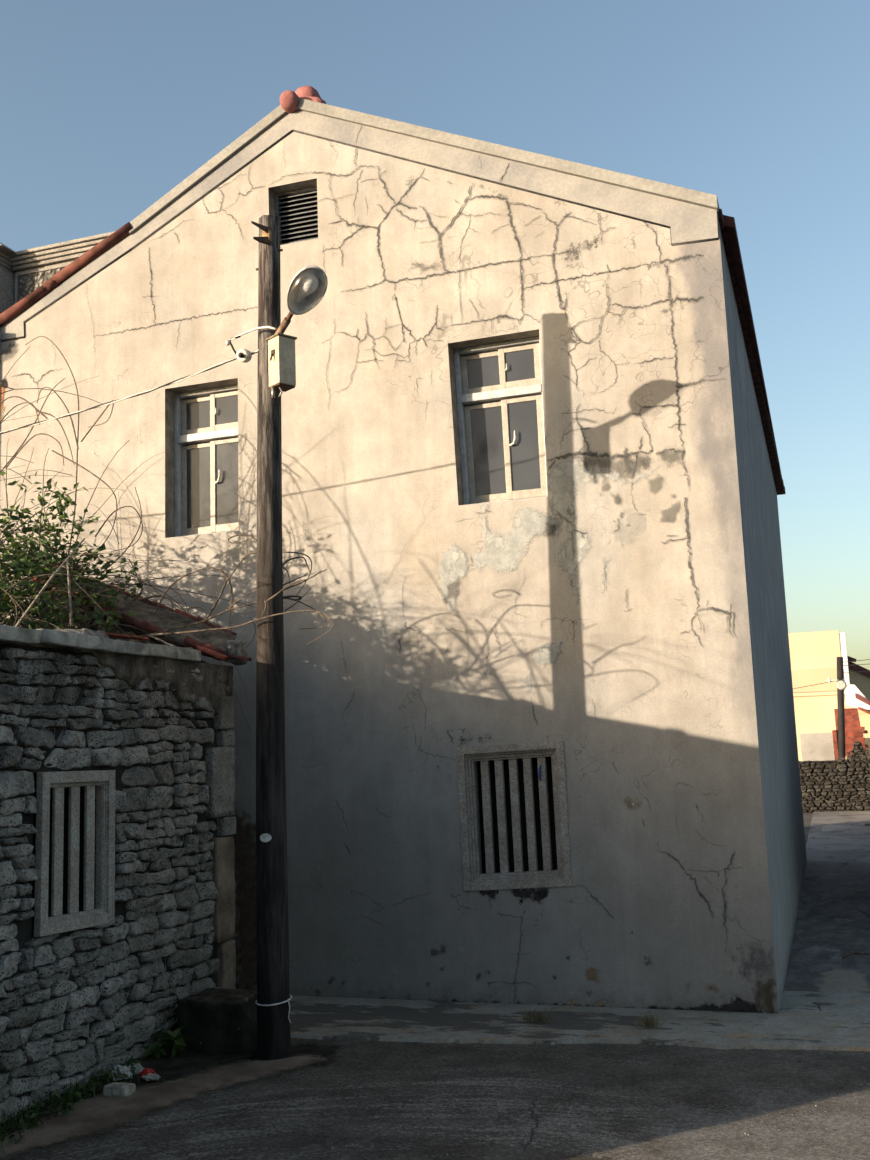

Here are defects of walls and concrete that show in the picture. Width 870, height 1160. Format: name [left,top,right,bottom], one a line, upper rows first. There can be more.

crack [94,229,258,337]
crack [202,126,705,608]
peeling [438,461,650,613]
crack [660,851,735,939]